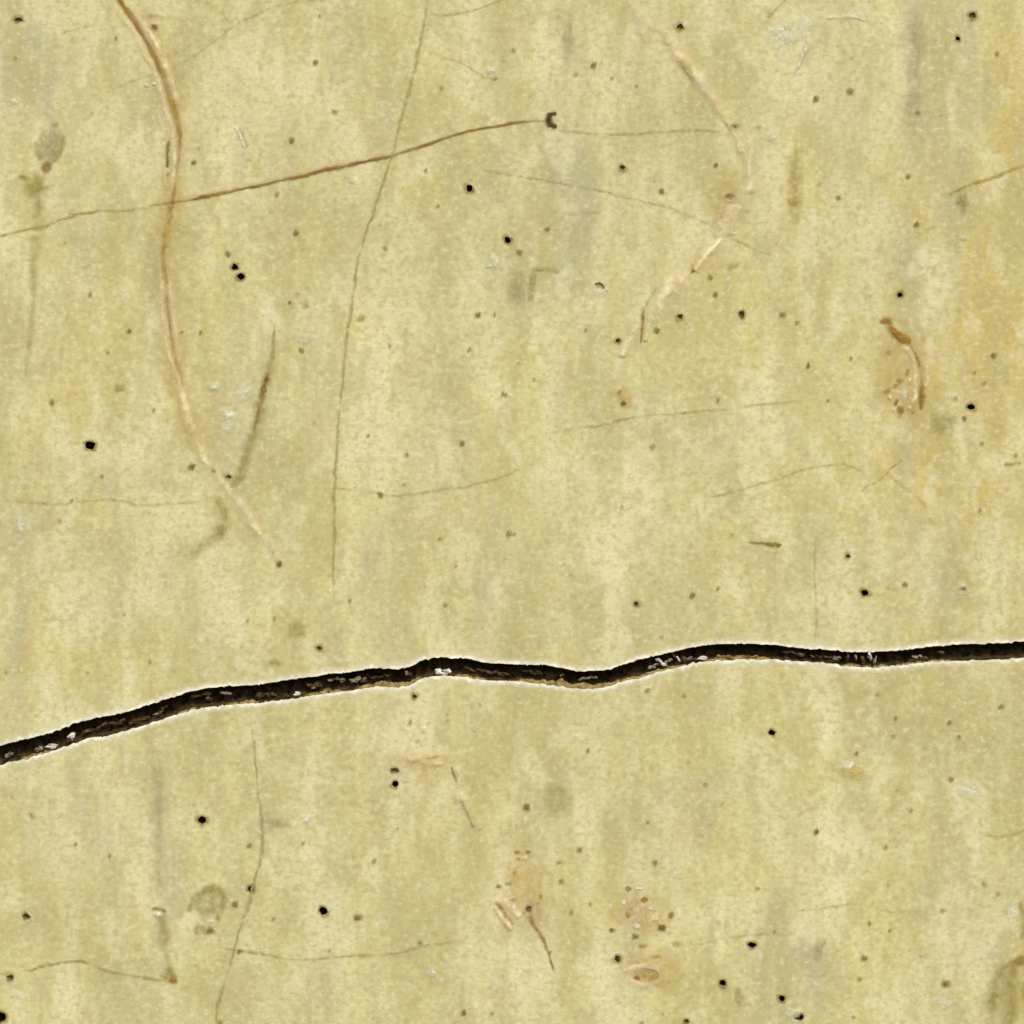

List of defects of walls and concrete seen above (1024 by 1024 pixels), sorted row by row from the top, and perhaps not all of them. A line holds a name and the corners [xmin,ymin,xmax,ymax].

crack [1,210,99,236]
crack [118,0,526,570]
crack [0,638,1024,769]
crack [231,806,277,959]